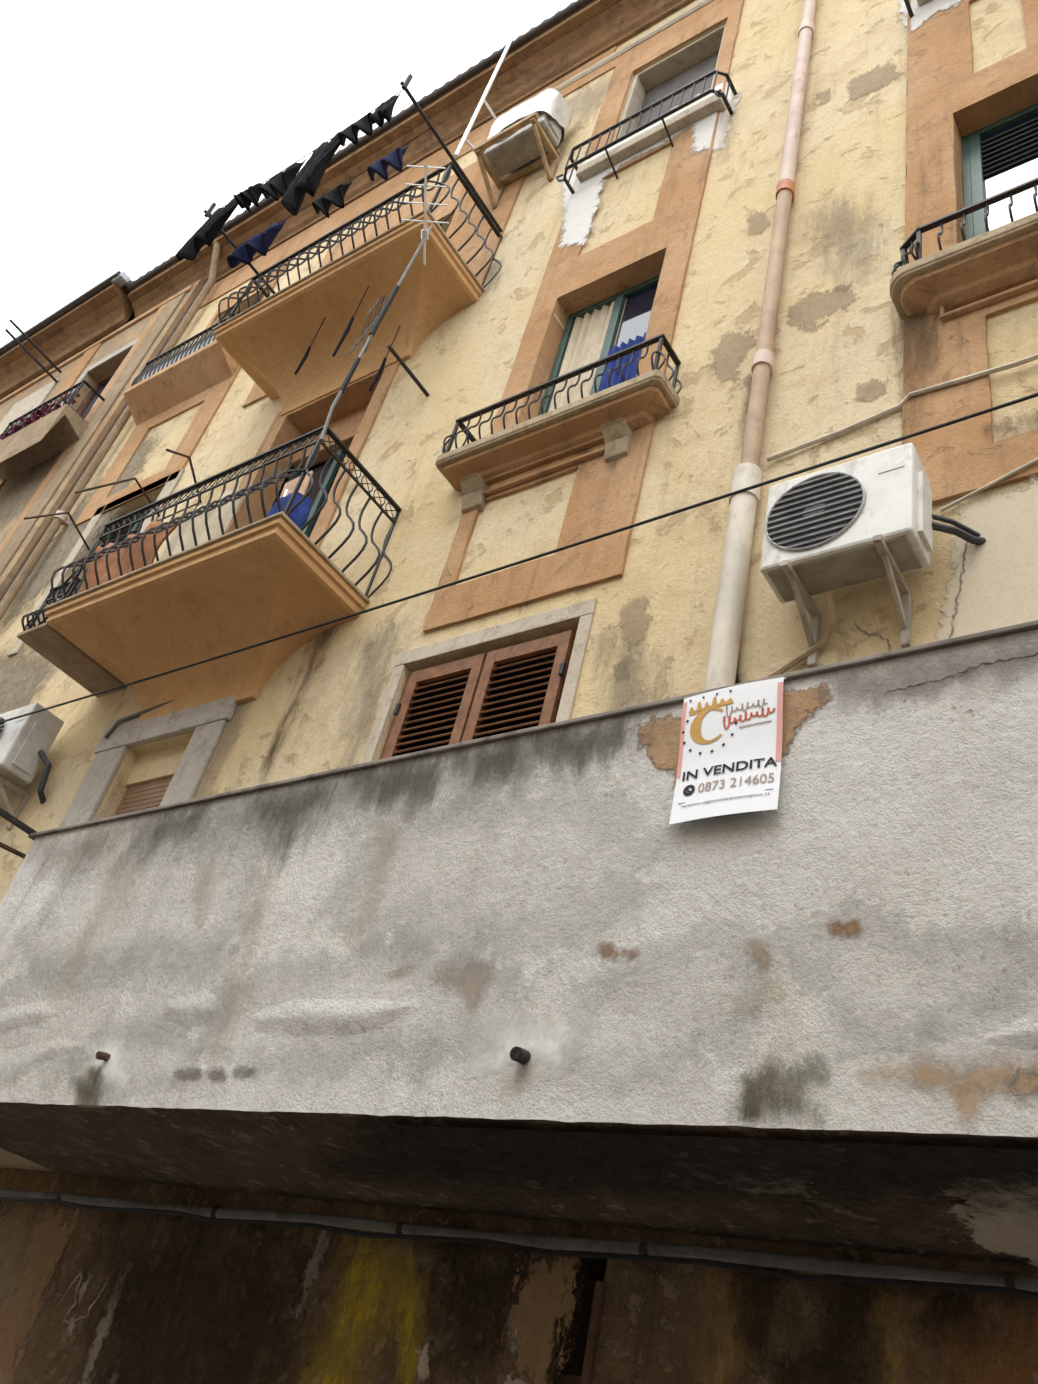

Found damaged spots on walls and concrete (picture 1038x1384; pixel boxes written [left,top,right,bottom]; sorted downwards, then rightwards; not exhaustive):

peeling [815,62,905,105]
peeling [786,280,860,333]
crack [949,541,967,639]
crack [855,622,891,652]
crack [886,652,1038,693]
water stain [474,740,519,781]
spalling [633,697,682,789]
spalling [782,683,832,756]
water stain [741,1056,826,1117]
water stain [327,1123,1038,1212]
water stain [401,1242,535,1384]
peeling [499,1250,581,1384]